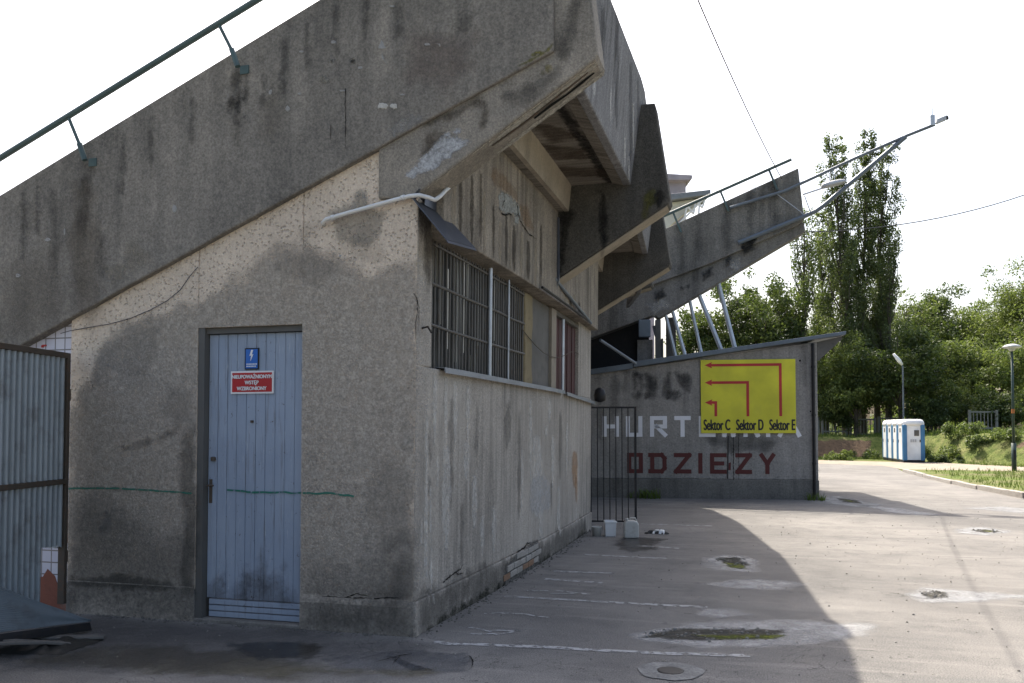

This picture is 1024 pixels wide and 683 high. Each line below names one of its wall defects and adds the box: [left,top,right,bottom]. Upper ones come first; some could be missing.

spalling [406,62,604,188]
water stain [67,245,447,637]
spalling [503,541,541,585]